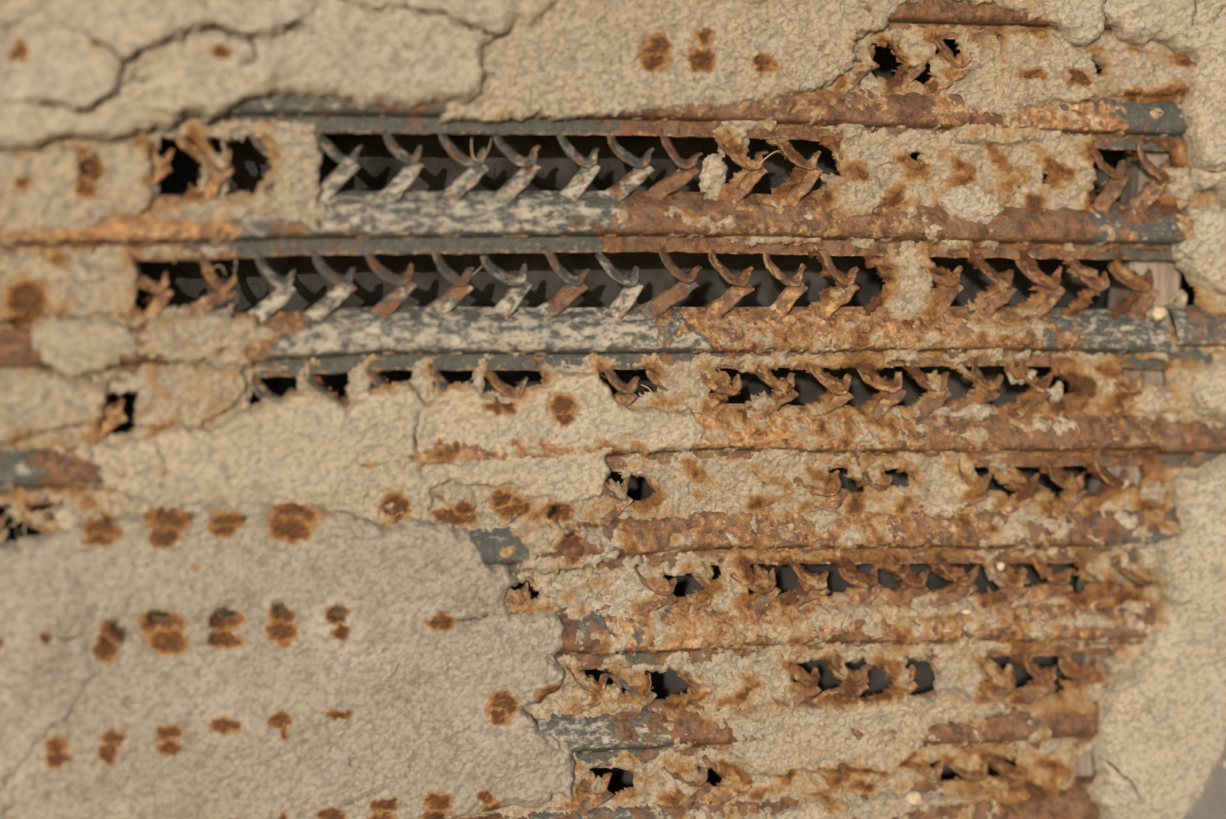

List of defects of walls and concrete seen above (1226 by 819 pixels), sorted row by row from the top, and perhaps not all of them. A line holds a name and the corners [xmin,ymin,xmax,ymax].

corrosion [639,27,716,73]
flaking render [0,114,331,234]
flaking render [437,0,1198,316]
flaking render [1081,131,1226,319]
corrosion [141,506,247,549]
corrosion [266,502,325,546]
corrosion [429,487,588,567]
flaking render [0,218,1226,819]
corrosion [91,609,189,665]
corrosion [263,602,298,648]
corrosion [325,605,352,642]
corrosion [484,682,562,727]